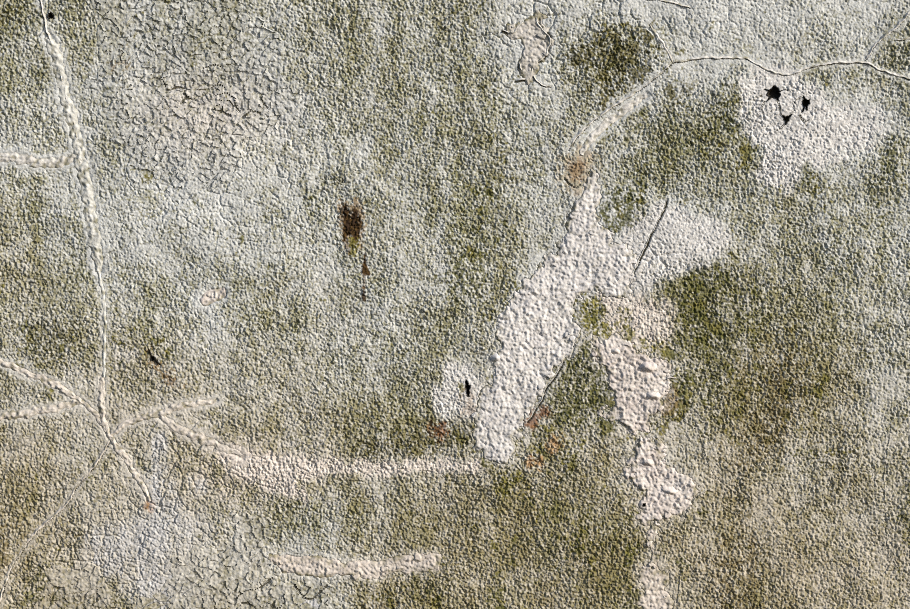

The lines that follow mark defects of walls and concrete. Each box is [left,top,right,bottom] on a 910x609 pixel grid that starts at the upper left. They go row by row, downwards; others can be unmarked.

crack [502,17,551,87]
peeling [506,10,555,85]
crack [568,9,910,156]
crack [0,0,305,602]
rust [335,195,372,302]
peeling [471,138,733,465]
crack [612,199,667,315]
leakage [0,474,43,609]
crack [32,510,335,609]
peeling [590,332,700,609]
leakage [678,301,844,609]
leakage [884,395,910,583]